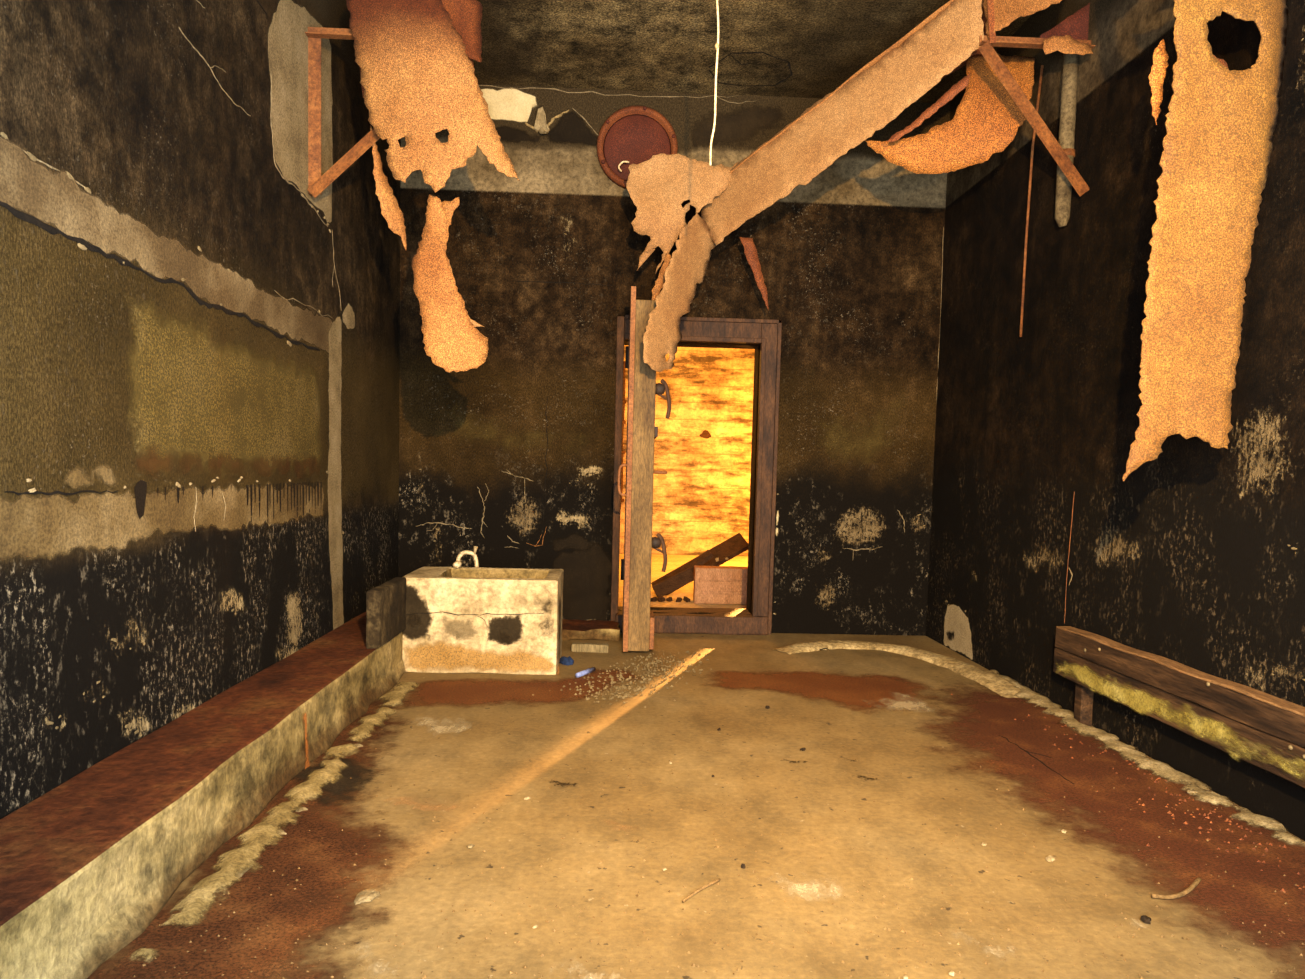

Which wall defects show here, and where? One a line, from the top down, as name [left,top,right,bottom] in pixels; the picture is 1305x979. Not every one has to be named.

flaking render [268,0,333,233]
peeling [481,89,598,146]
water stain [569,465,602,486]
water stain [835,506,886,545]
water stain [402,585,522,645]
water stain [506,496,612,657]
water stain [816,585,835,610]
water stain [293,759,371,805]
rust [87,642,638,979]
rust [712,671,1305,979]